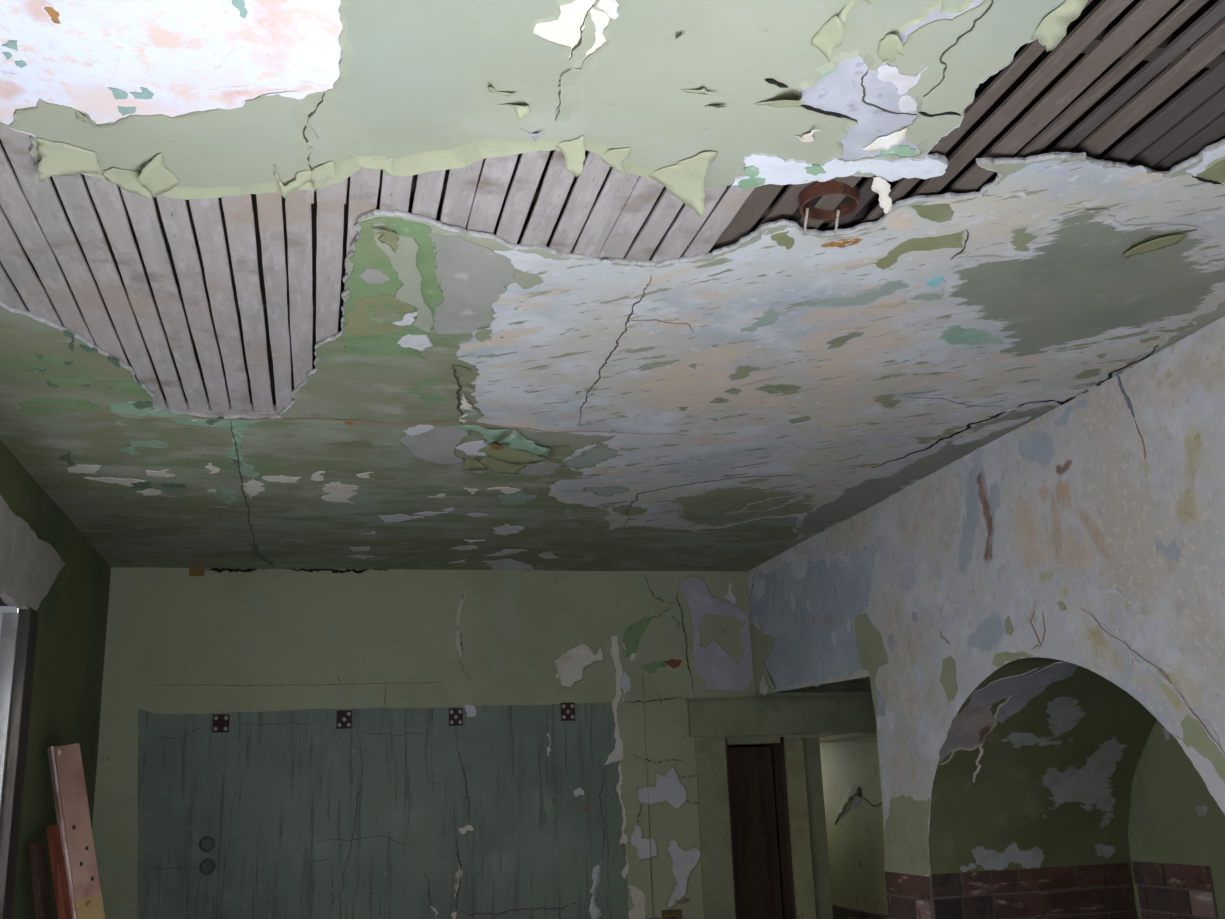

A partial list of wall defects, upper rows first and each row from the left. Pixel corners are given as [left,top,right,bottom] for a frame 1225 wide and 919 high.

crack [530,0,620,122]
peeling [0,0,1225,531]
crack [1,364,680,574]
peeling [346,494,559,571]
peeling [671,545,877,695]
crack [792,345,1159,540]
crack [1030,611,1046,650]
crack [1053,562,1225,756]
peeling [555,616,701,919]
peeling [959,839,1063,872]
peeling [939,661,1133,860]